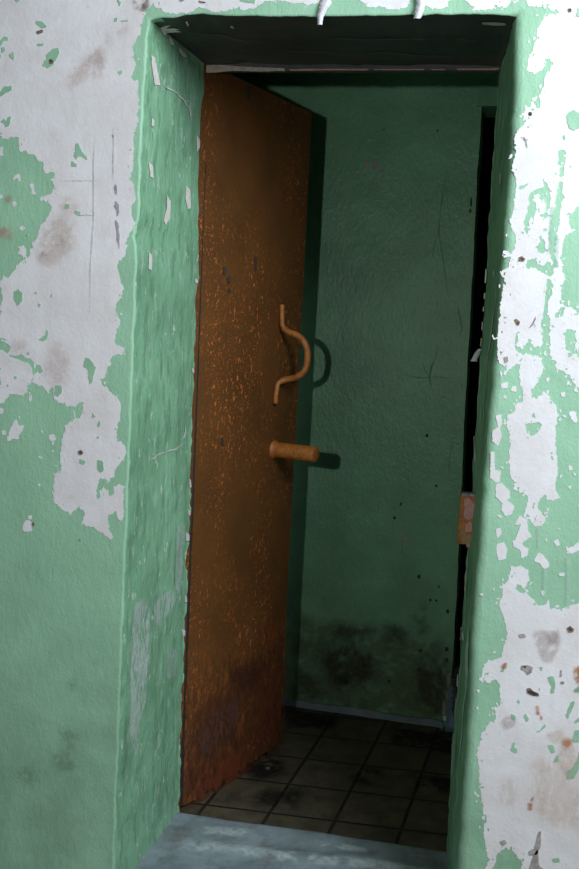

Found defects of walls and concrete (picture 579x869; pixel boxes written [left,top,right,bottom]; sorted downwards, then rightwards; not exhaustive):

peeling [360,0,450,19]
peeling [206,65,445,73]
peeling [0,0,332,539]
peeling [465,0,579,869]
peeling [461,497,474,544]